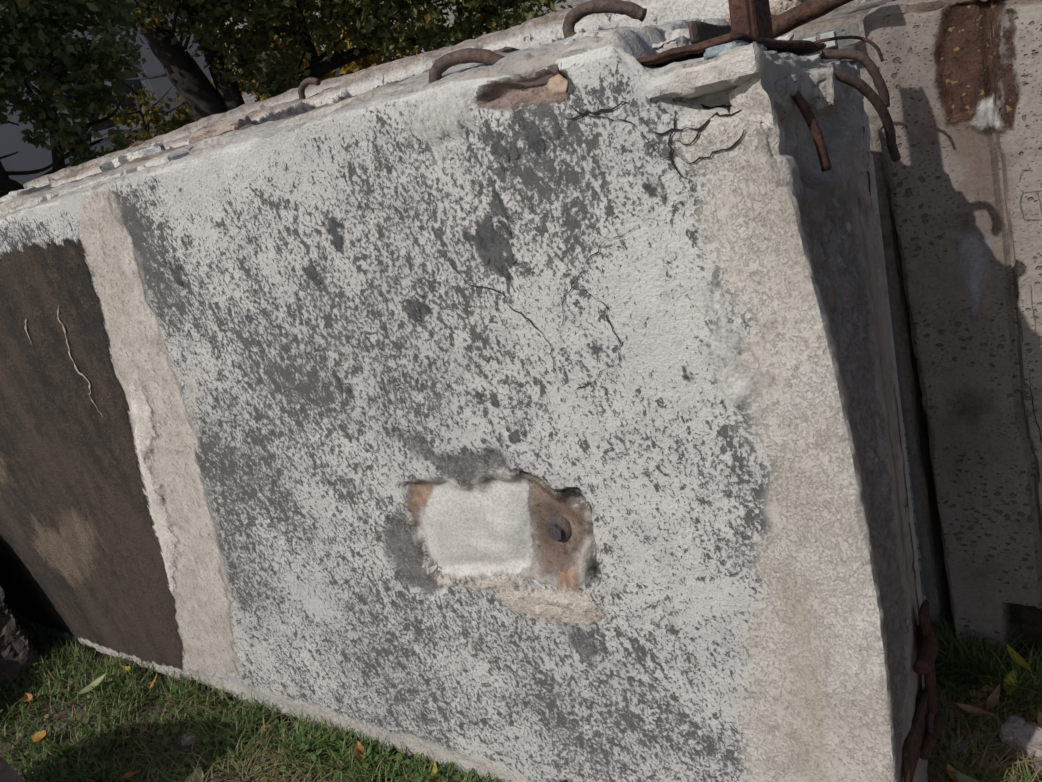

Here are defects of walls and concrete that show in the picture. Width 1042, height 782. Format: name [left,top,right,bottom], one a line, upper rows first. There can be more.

corrosion [771,0,854,39]
spalling [814,49,901,162]
spalling [792,90,832,172]
peeling [642,181,666,204]
peeling [321,216,344,252]
peeling [462,190,515,280]
peeling [301,264,320,287]
peeling [402,294,430,324]
peeling [334,375,350,393]
peeling [475,387,503,408]
peeling [506,425,526,444]
spalling [384,431,604,657]